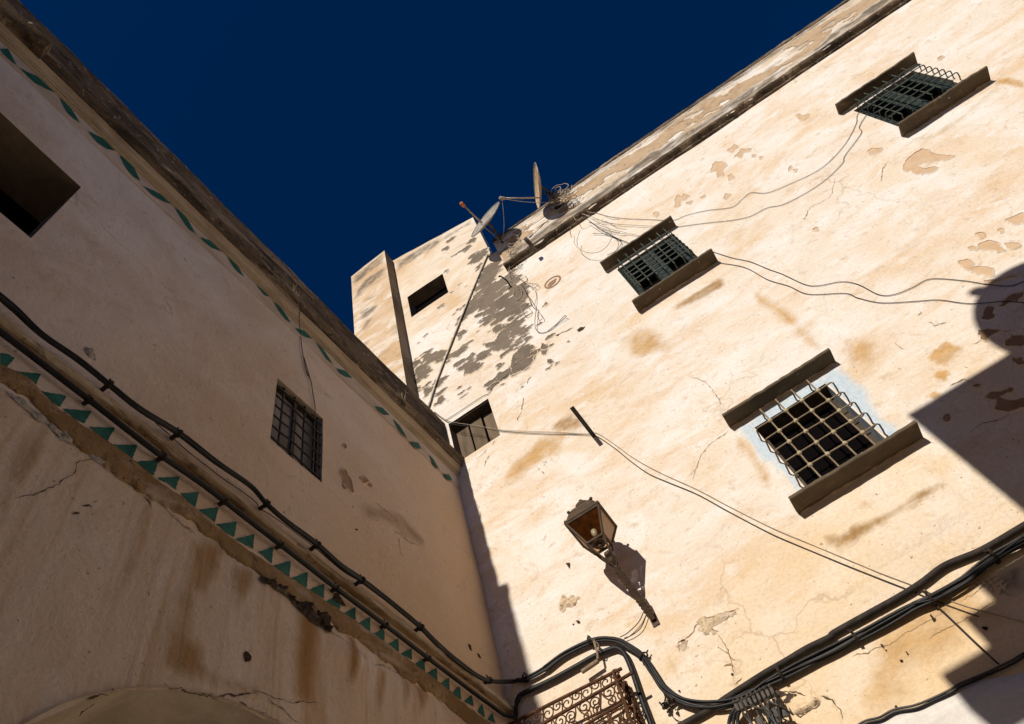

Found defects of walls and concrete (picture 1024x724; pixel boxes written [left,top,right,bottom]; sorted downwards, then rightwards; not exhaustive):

peeling [902,148,956,176]
peeling [411,0,879,407]
peeling [956,212,1024,367]
crack [6,395,196,535]
leakage [502,428,571,486]
leakage [822,482,948,554]
flaking render [260,576,334,632]
flaking render [559,595,580,612]
crack [678,608,742,684]
flaking render [696,611,737,635]
crack [80,688,116,715]
crack [166,684,317,724]